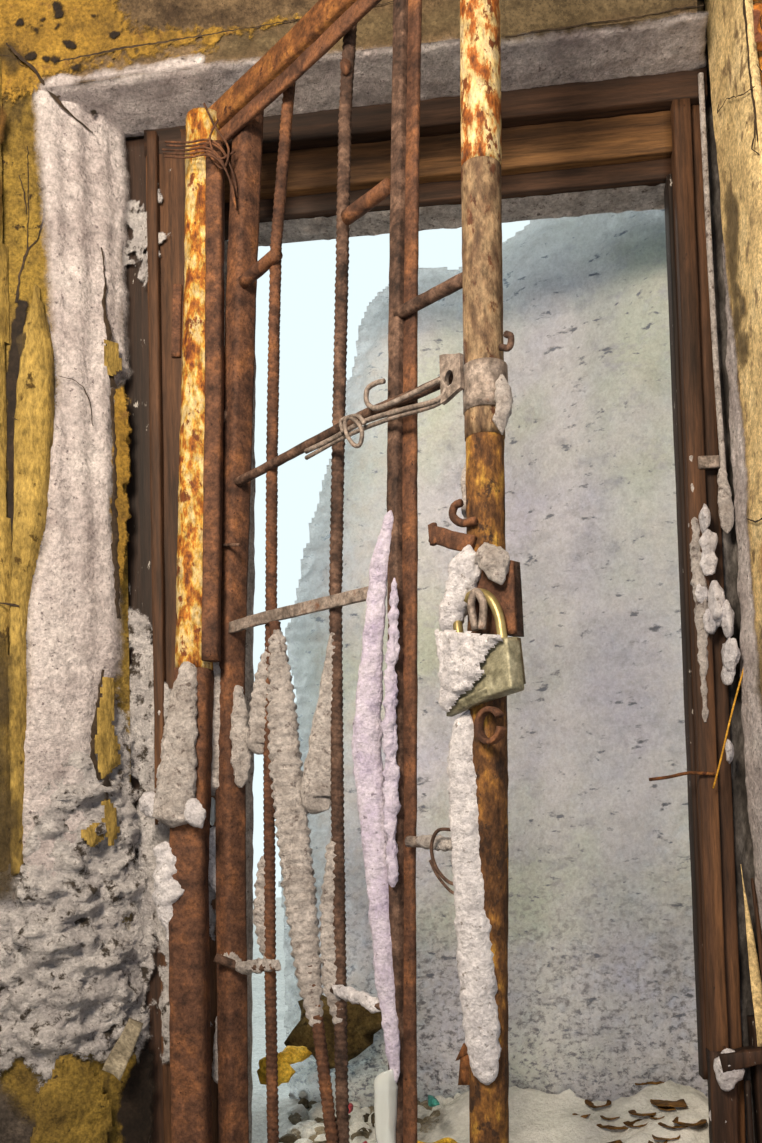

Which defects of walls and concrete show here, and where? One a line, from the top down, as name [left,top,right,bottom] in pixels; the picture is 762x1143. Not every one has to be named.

spalling [101,247,132,619]
flaking render [81,669,121,847]
spalling [30,1017,156,1143]